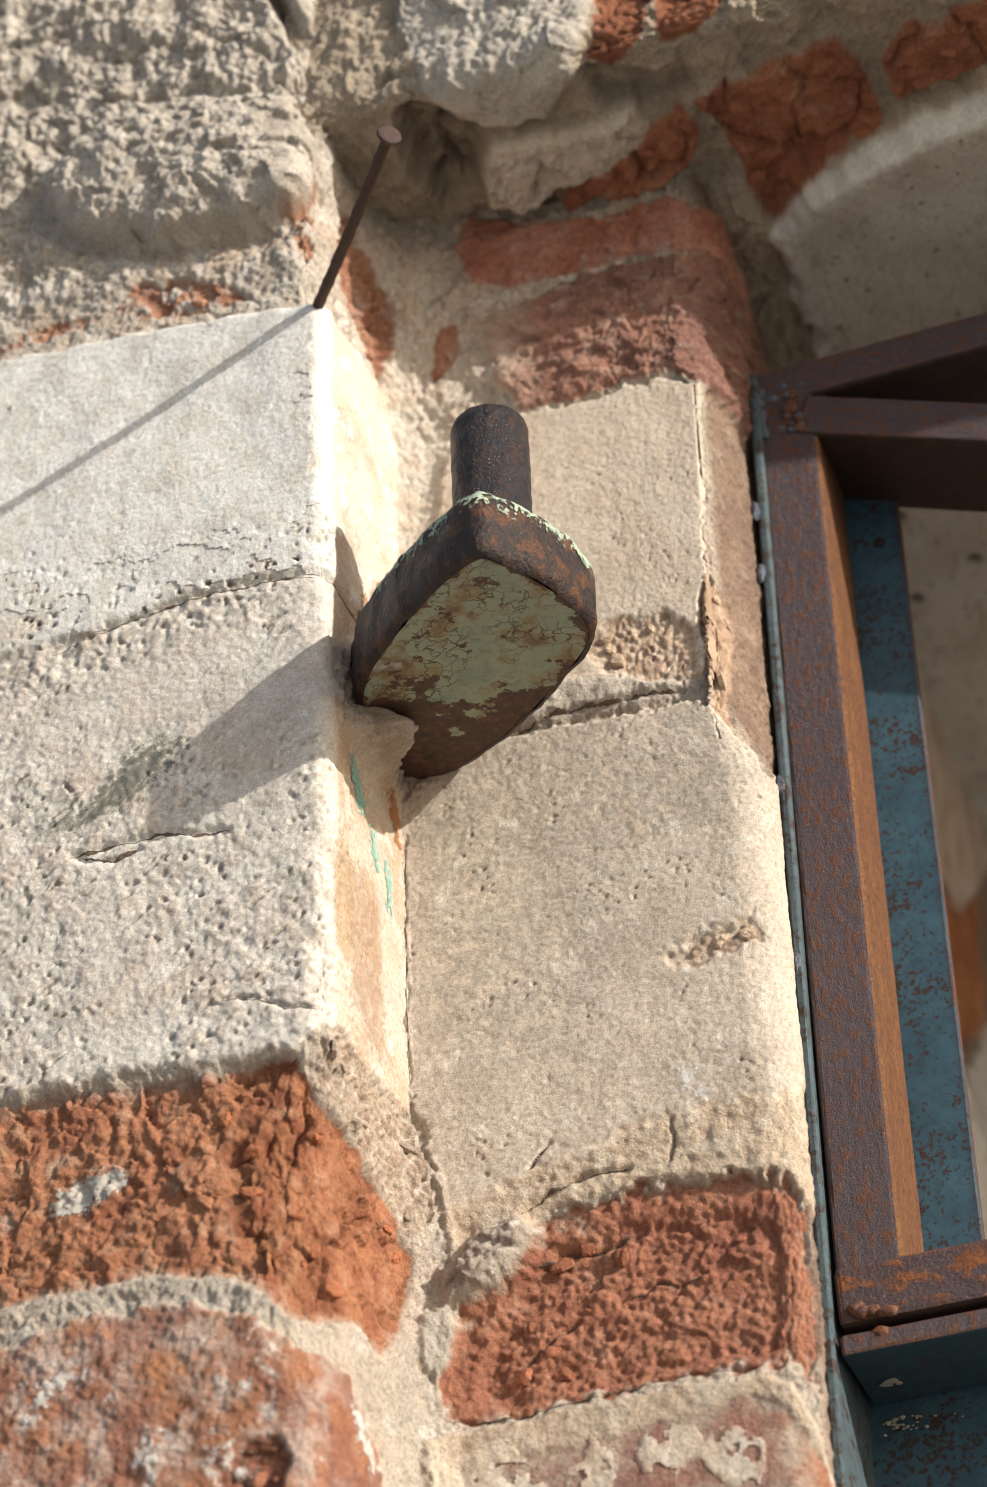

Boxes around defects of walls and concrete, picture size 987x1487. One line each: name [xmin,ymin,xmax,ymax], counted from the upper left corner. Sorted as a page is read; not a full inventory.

flaking render [562,0,987,360]
crack [76,830,228,863]
crack [521,689,678,733]
flaking render [899,507,987,832]
spalling [213,1028,441,1333]
spalling [479,1209,789,1414]